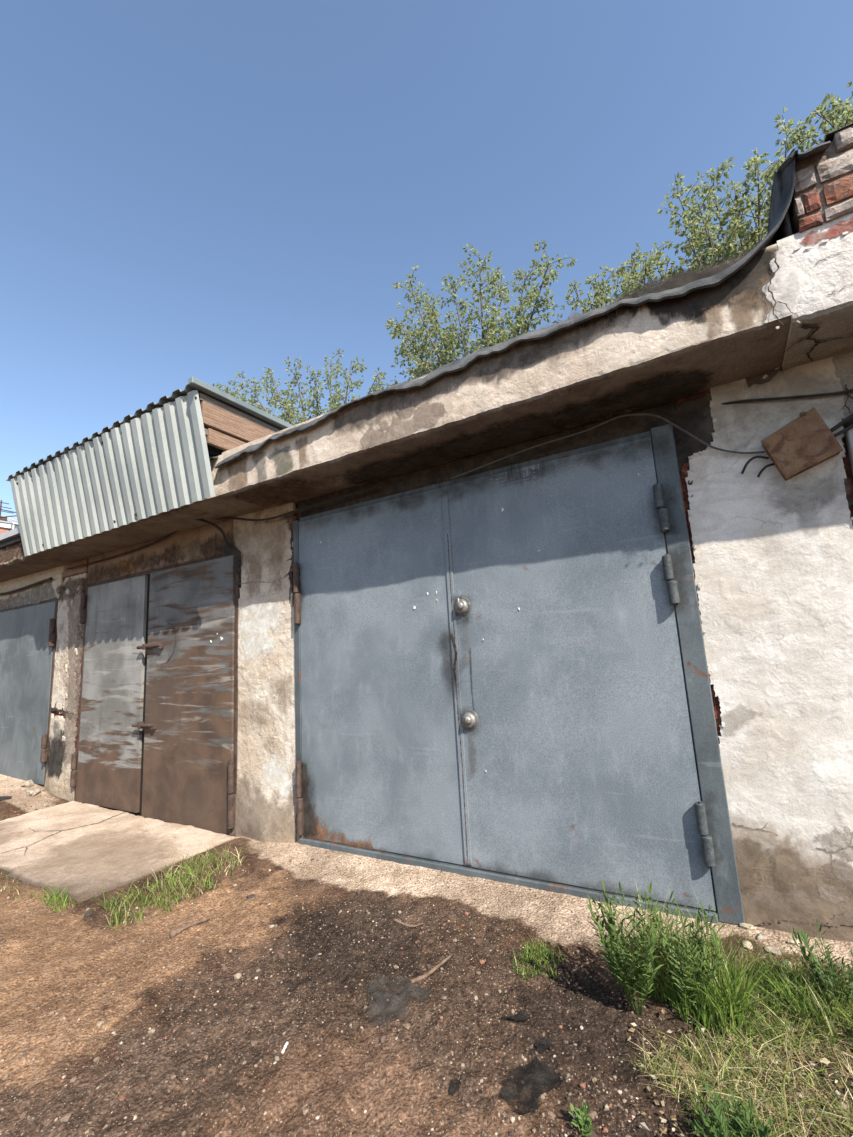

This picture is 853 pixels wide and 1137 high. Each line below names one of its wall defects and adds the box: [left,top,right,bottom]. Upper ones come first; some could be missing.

water stain [706,275,788,337]
crack [756,257,853,385]
flaking render [763,218,853,330]
corrosion [308,806,381,852]
water stain [734,834,853,942]